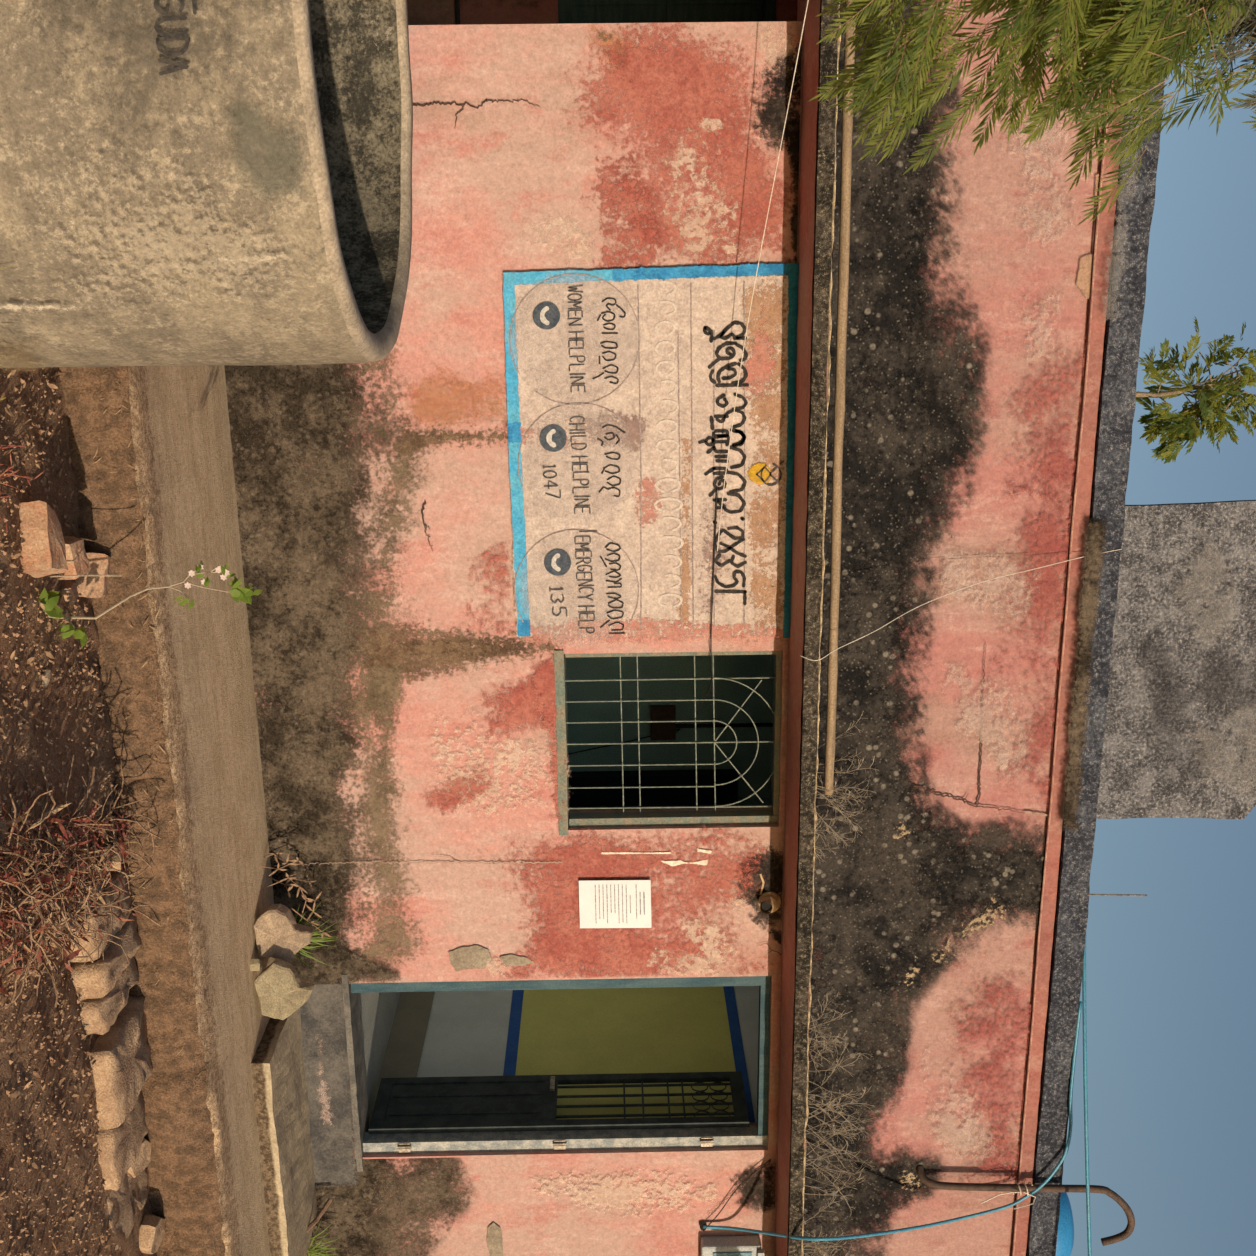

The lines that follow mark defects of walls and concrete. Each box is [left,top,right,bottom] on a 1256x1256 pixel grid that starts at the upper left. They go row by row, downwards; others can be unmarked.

crack [413,99,540,128]
peeling [525,23,796,269]
water stain [1014,121,1072,240]
water stain [803,0,1046,1256]
water stain [224,359,568,1256]
crack [914,641,1048,816]
peeling [449,828,766,979]